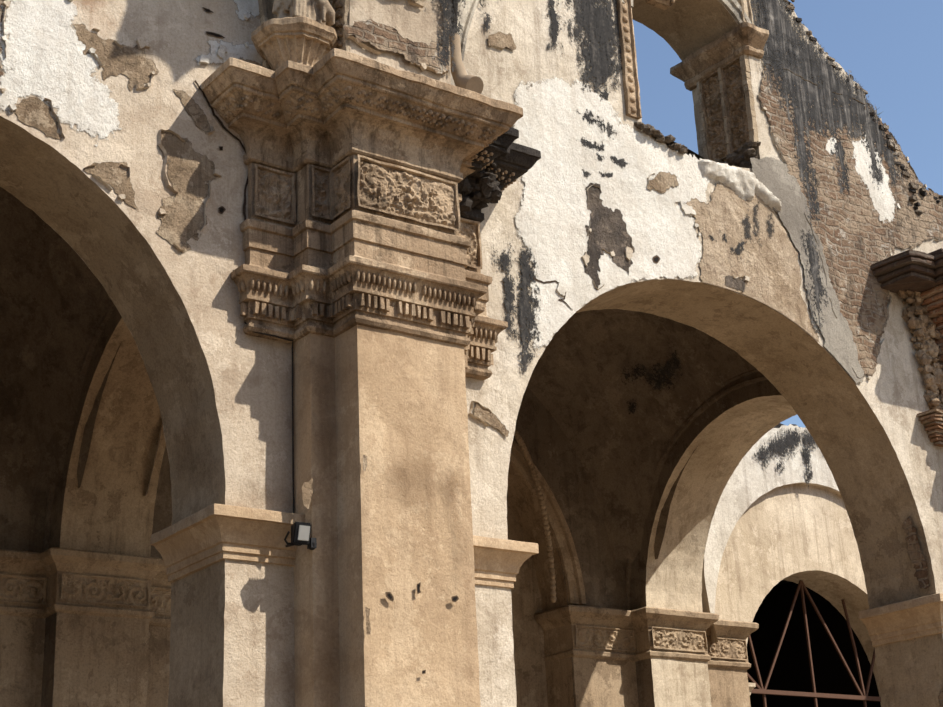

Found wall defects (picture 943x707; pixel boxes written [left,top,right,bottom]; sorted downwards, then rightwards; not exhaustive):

spalling [73,24,159,91]
spalling [343,19,449,74]
leakage [545,0,623,101]
spalling [156,129,226,253]
crack [194,80,246,153]
crack [241,177,249,221]
leakage [576,109,630,178]
spalling [581,183,635,290]
leakage [750,0,904,338]
flaking render [758,64,943,411]
leakage [492,239,541,376]
leakage [754,428,818,489]